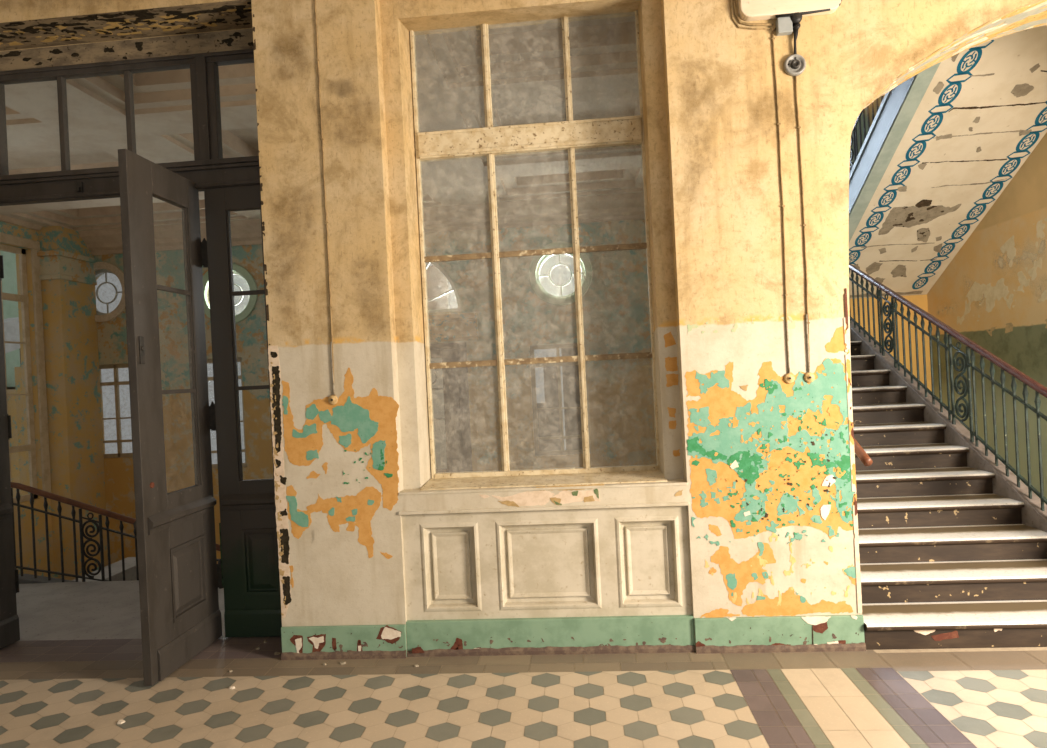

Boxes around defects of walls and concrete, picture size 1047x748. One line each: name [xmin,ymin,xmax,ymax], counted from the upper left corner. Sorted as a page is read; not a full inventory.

peeling [0,0,256,71]
flaking render [878,199,961,253]
flaking render [853,248,907,286]
peeling [268,344,399,618]
peeling [479,483,604,507]
peeling [664,288,862,645]
peeling [290,625,424,653]
peeling [433,638,493,650]